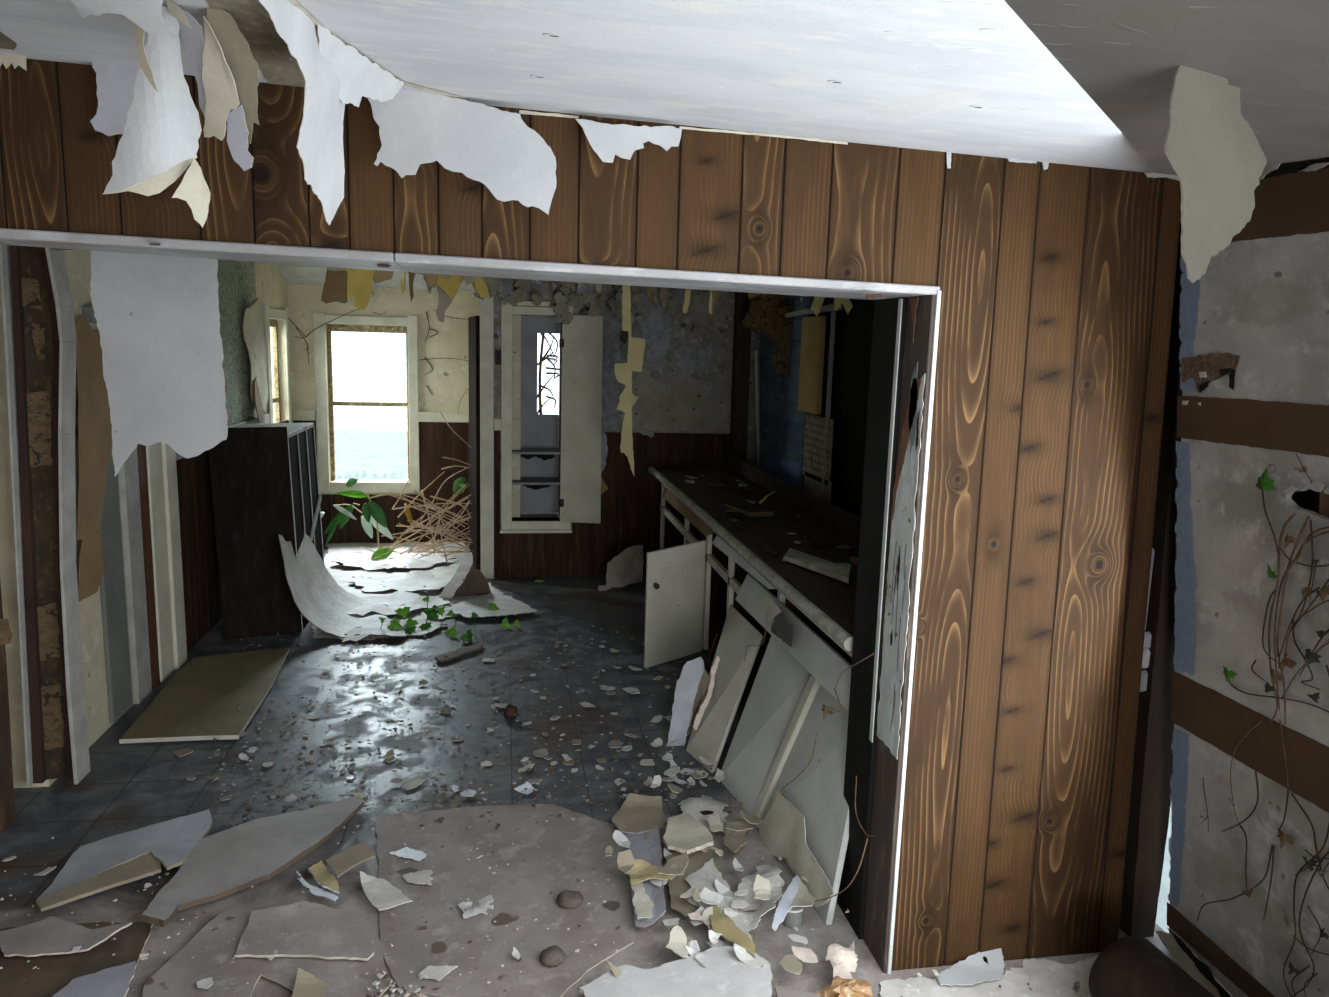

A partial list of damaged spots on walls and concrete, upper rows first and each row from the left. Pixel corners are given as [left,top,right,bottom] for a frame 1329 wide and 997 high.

peeling [90,62,139,136]
peeling [166,0,305,171]
peeling [576,119,682,163]
peeling [1007,158,1049,170]
peeling [1144,65,1329,283]
peeling [811,294,883,316]
peeling [242,299,269,423]
peeling [321,264,691,475]
flaking render [1284,480,1329,518]